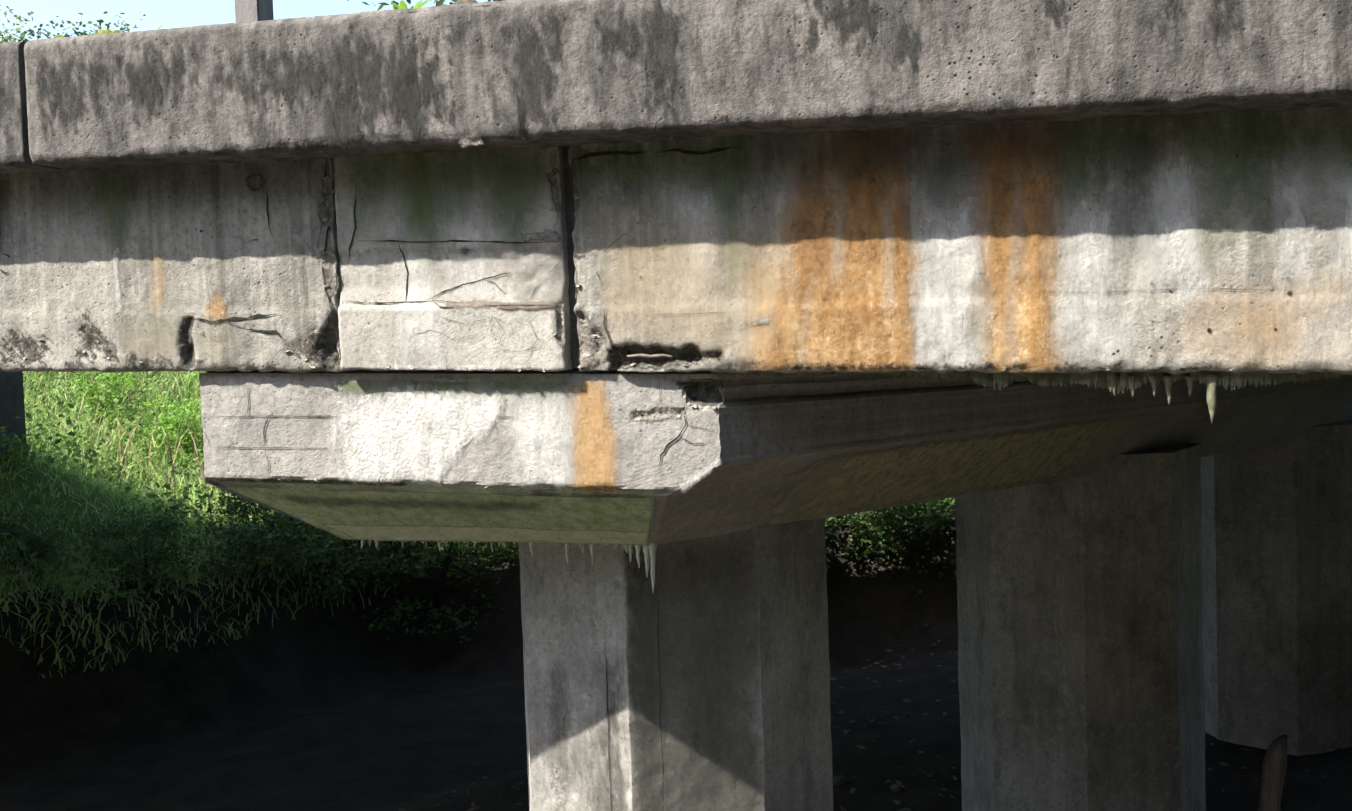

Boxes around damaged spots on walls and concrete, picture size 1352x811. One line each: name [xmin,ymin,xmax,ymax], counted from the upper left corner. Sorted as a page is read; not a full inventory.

water stain [36,38,202,147]
water stain [214,19,459,146]
crack [196,314,283,339]
spalling [285,249,341,370]
spalling [318,175,335,232]
crack [315,158,562,354]
spalling [552,270,724,422]
rust [759,147,912,369]
rust [986,164,1050,370]
rust [578,382,613,492]
crack [658,384,714,468]
water stain [323,524,756,811]